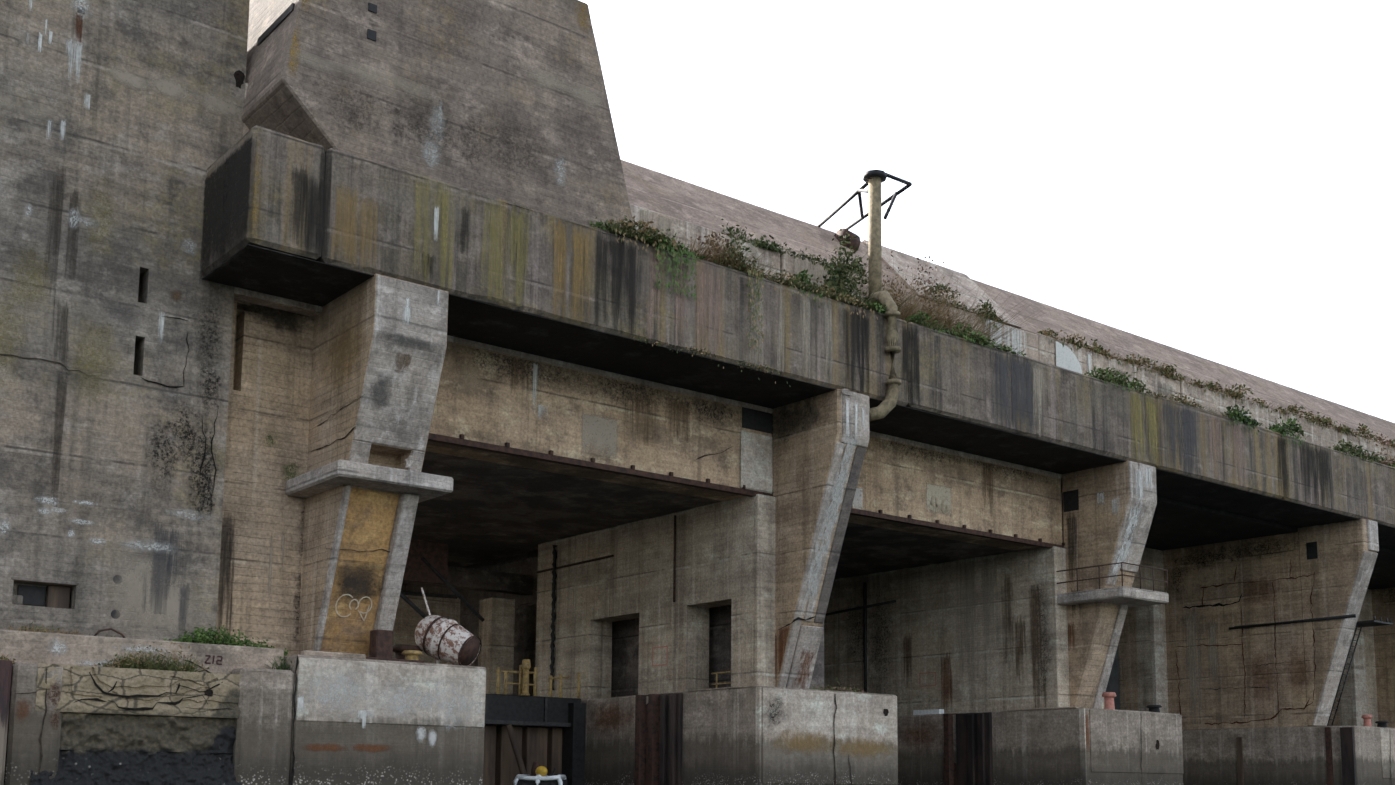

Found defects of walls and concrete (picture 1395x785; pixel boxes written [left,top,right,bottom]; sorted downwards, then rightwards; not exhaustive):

water stain [187,137,252,279]
water stain [293,153,372,256]
water stain [416,187,527,302]
water stain [554,225,721,346]
water stain [795,258,830,283]
water stain [148,411,214,519]
water stain [473,349,734,422]
water stain [986,320,1091,427]
water stain [1131,389,1248,469]
water stain [218,522,234,624]
crack [15,660,229,776]
water stain [418,728,436,745]